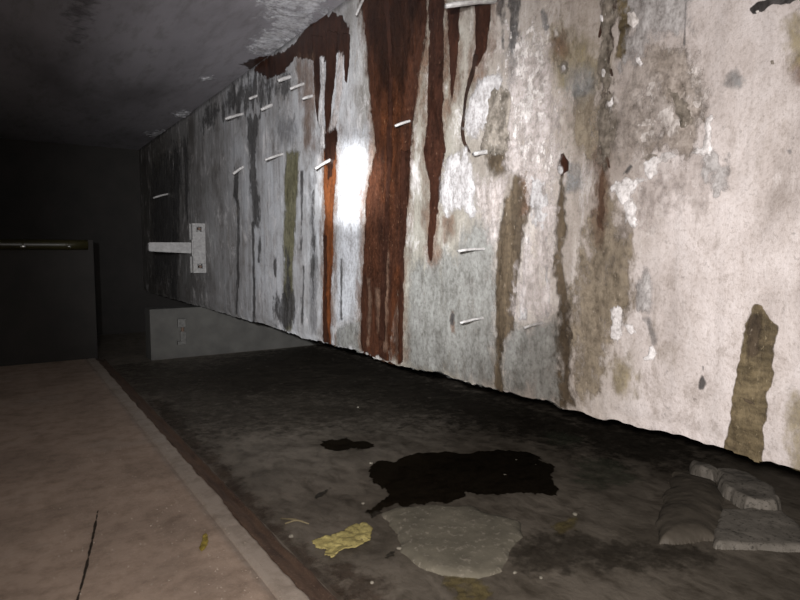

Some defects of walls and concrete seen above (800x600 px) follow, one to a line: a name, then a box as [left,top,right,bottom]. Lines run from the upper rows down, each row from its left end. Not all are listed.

damp [202,72,290,322]
rust [240,11,350,344]
damp [273,150,317,332]
rust [358,0,495,364]
damp [439,0,598,409]